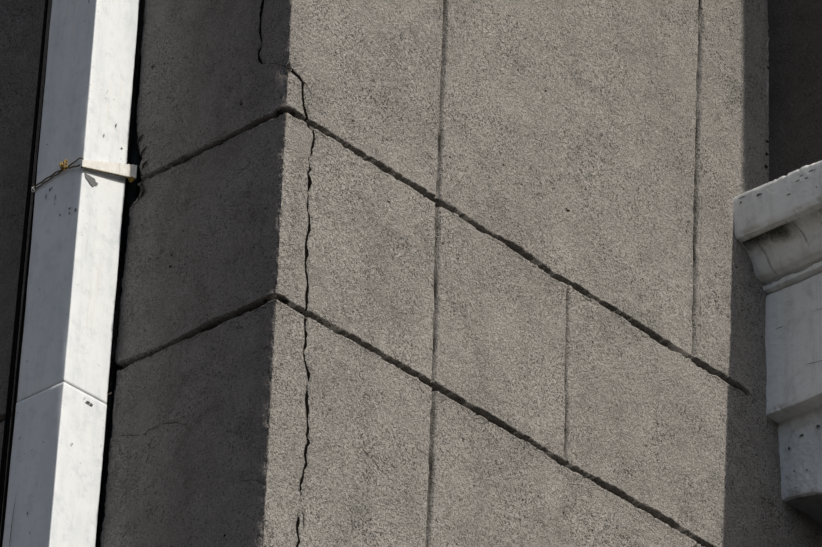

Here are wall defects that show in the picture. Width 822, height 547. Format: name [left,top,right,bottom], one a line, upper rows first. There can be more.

crack [258,0,315,547]